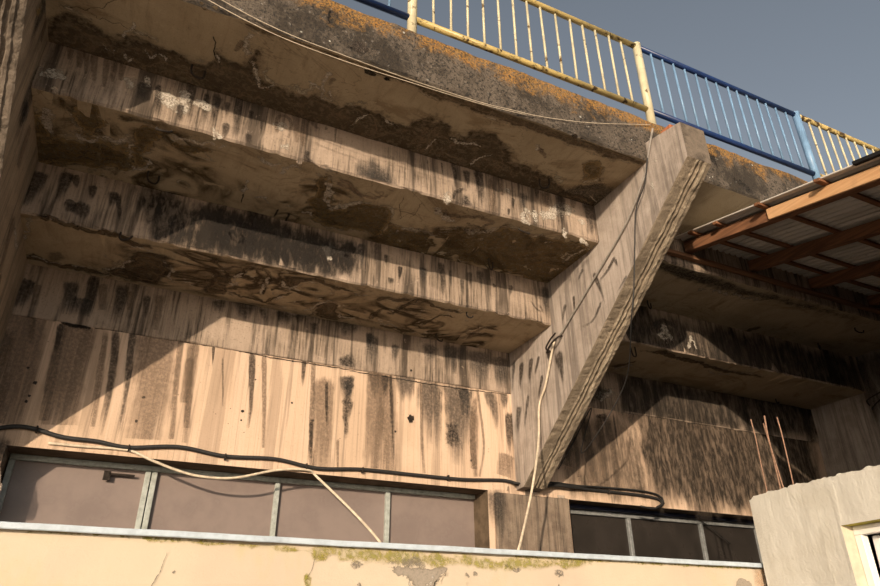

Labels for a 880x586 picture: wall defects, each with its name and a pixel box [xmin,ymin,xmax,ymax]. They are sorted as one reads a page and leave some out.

leakage [0,0,643,439]
leakage [660,263,834,312]
leakage [301,361,353,466]
leakage [367,371,529,476]
leakage [565,361,820,514]
leakage [623,306,880,416]
flaking render [392,565,448,586]